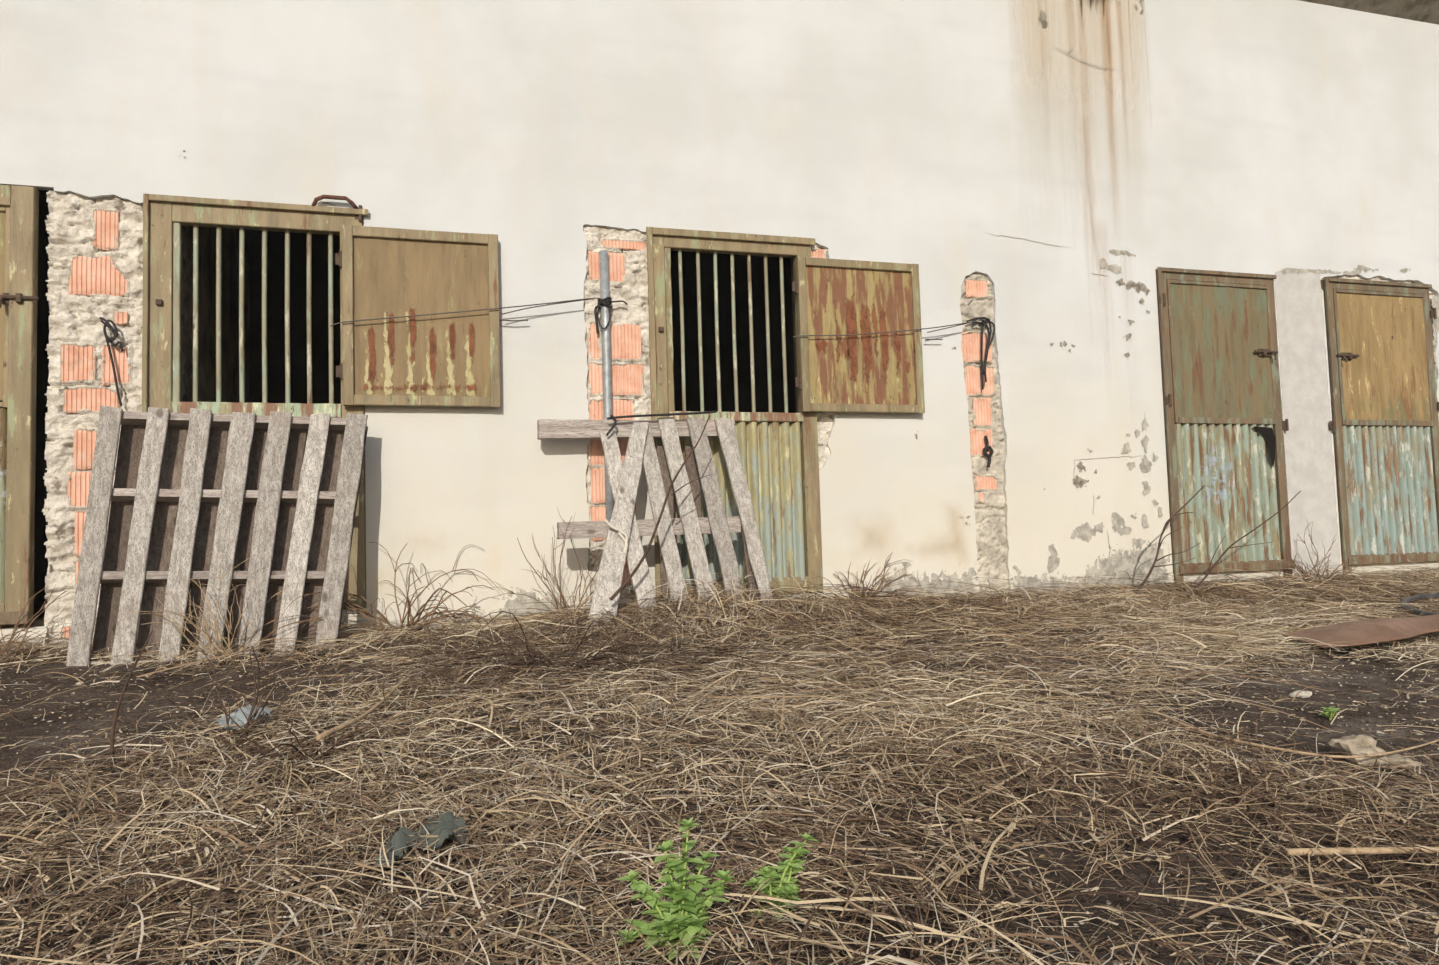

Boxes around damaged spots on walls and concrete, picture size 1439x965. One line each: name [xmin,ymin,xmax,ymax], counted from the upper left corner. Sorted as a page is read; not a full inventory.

damp [1020,0,1136,55]
corrosion [363,308,476,392]
spalling [583,225,651,420]
corrosion [816,294,910,393]
peeling [1099,249,1150,358]
spalling [42,190,143,644]
spalling [851,272,1170,603]
spalling [586,438,629,604]
spalling [619,557,637,602]